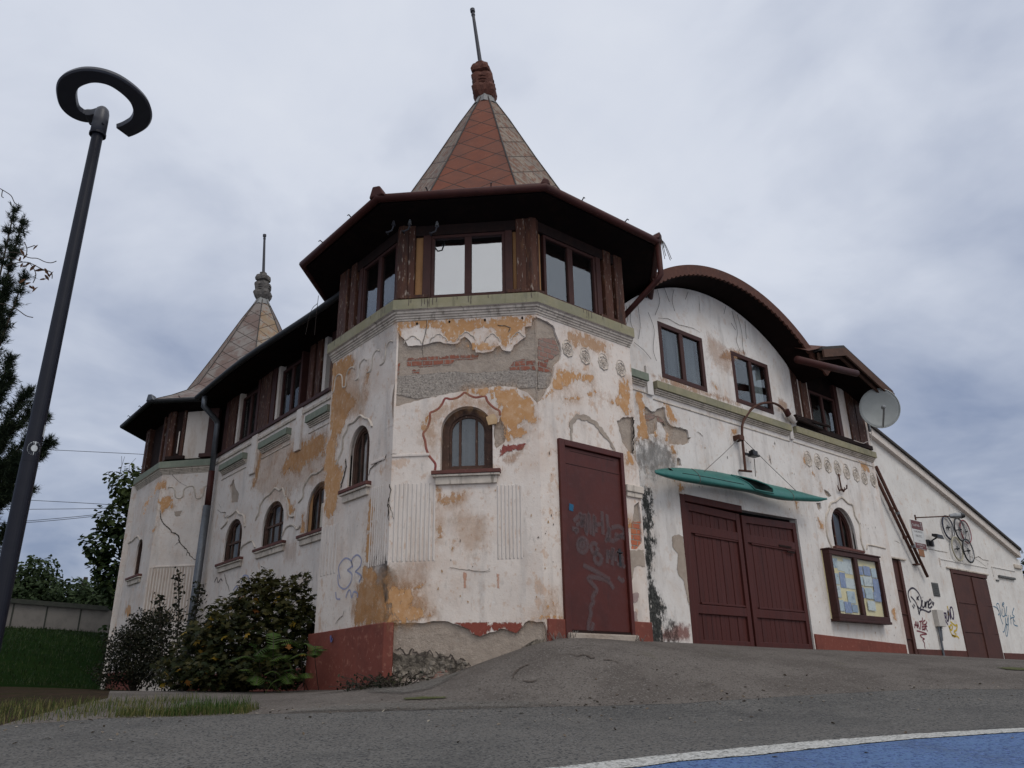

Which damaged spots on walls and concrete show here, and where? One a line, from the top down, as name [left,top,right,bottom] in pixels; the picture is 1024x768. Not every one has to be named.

peeling [282,355,356,520]
flaking render [396,315,606,457]
flaking render [611,379,690,466]
crack [160,511,196,560]
flaking render [354,497,563,683]
damp [641,488,677,642]
peeling [672,535,690,605]